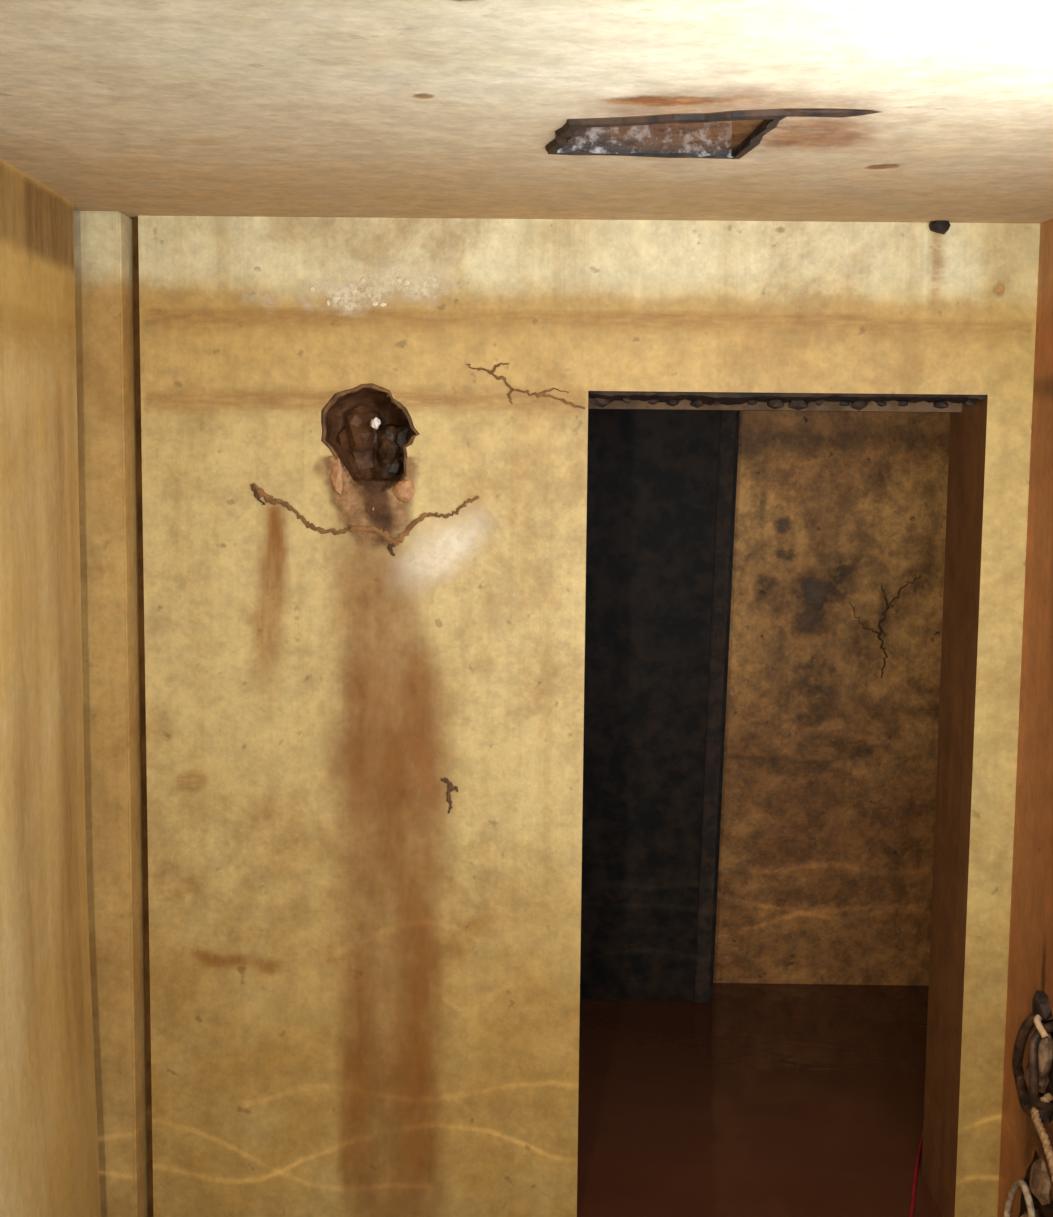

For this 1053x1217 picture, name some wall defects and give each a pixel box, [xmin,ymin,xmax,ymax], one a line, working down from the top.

corrosion [610,97,729,106]
corrosion [780,108,880,118]
crack [466,363,585,409]
crack [251,483,479,556]
damp [791,561,857,632]